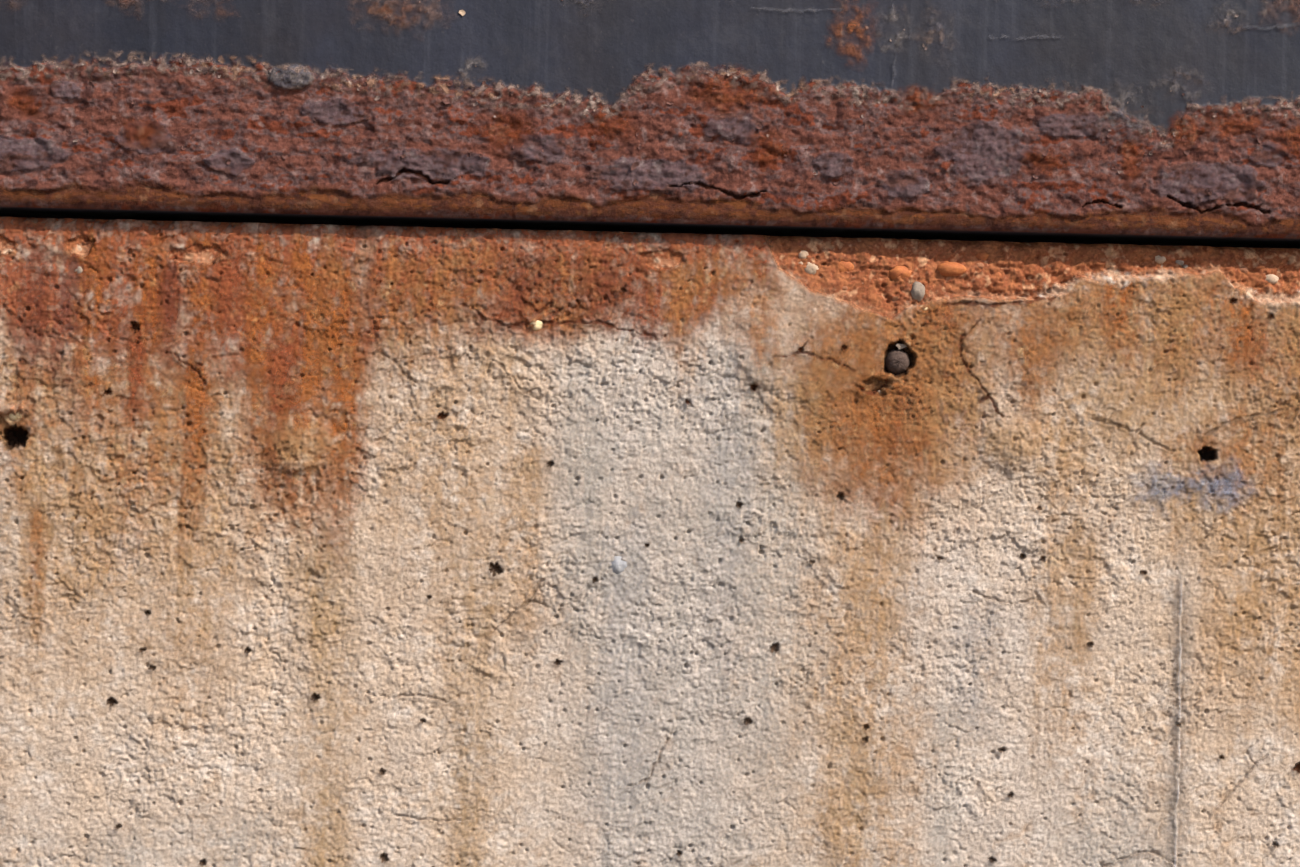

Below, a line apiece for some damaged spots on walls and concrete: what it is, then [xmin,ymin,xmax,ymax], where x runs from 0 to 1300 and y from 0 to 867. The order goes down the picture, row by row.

corrosion [358,0,437,25]
corrosion [838,8,869,57]
corrosion [0,216,778,504]
corrosion [801,299,967,487]
crack [955,297,1055,417]
corrosion [997,271,1300,401]